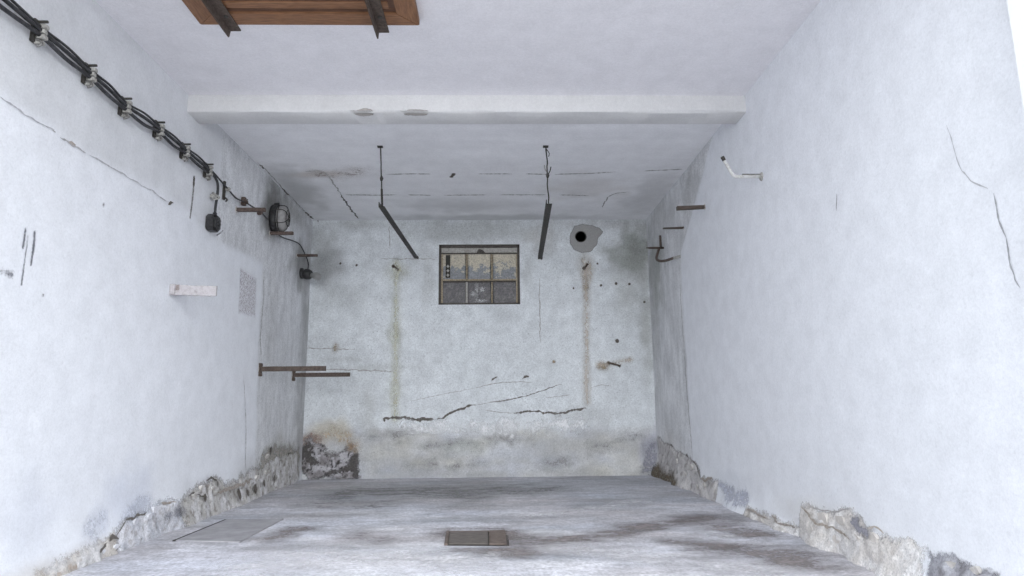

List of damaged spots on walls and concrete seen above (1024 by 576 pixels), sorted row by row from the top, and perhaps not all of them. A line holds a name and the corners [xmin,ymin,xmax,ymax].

crack [306,171,476,219]
crack [490,172,625,207]
crack [946,125,1020,287]
crack [383,381,609,422]
flaking render [651,437,719,502]
flaking render [35,436,361,576]
flaking render [744,503,999,576]